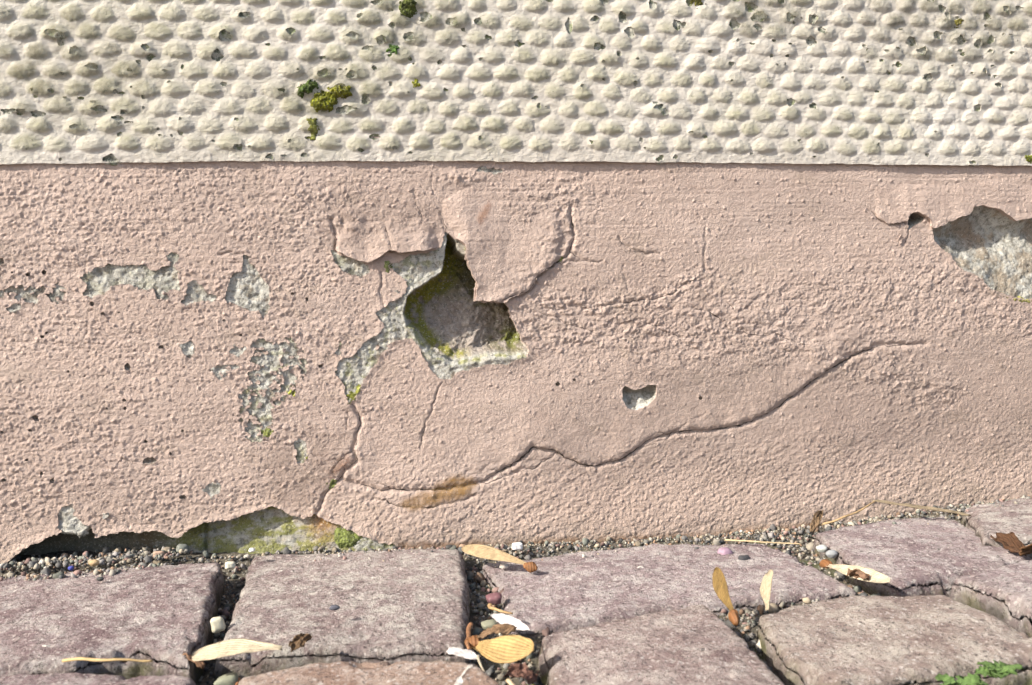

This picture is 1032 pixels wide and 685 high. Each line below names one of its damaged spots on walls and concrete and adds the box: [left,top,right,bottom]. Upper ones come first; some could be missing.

peeling [0,270,66,314]
peeling [80,252,270,318]
spalling [331,232,528,403]
spalling [897,213,923,244]
spalling [932,206,1032,299]
peeling [210,334,323,442]
crack [313,344,914,512]
hole [622,385,656,410]
spalling [19,504,396,555]